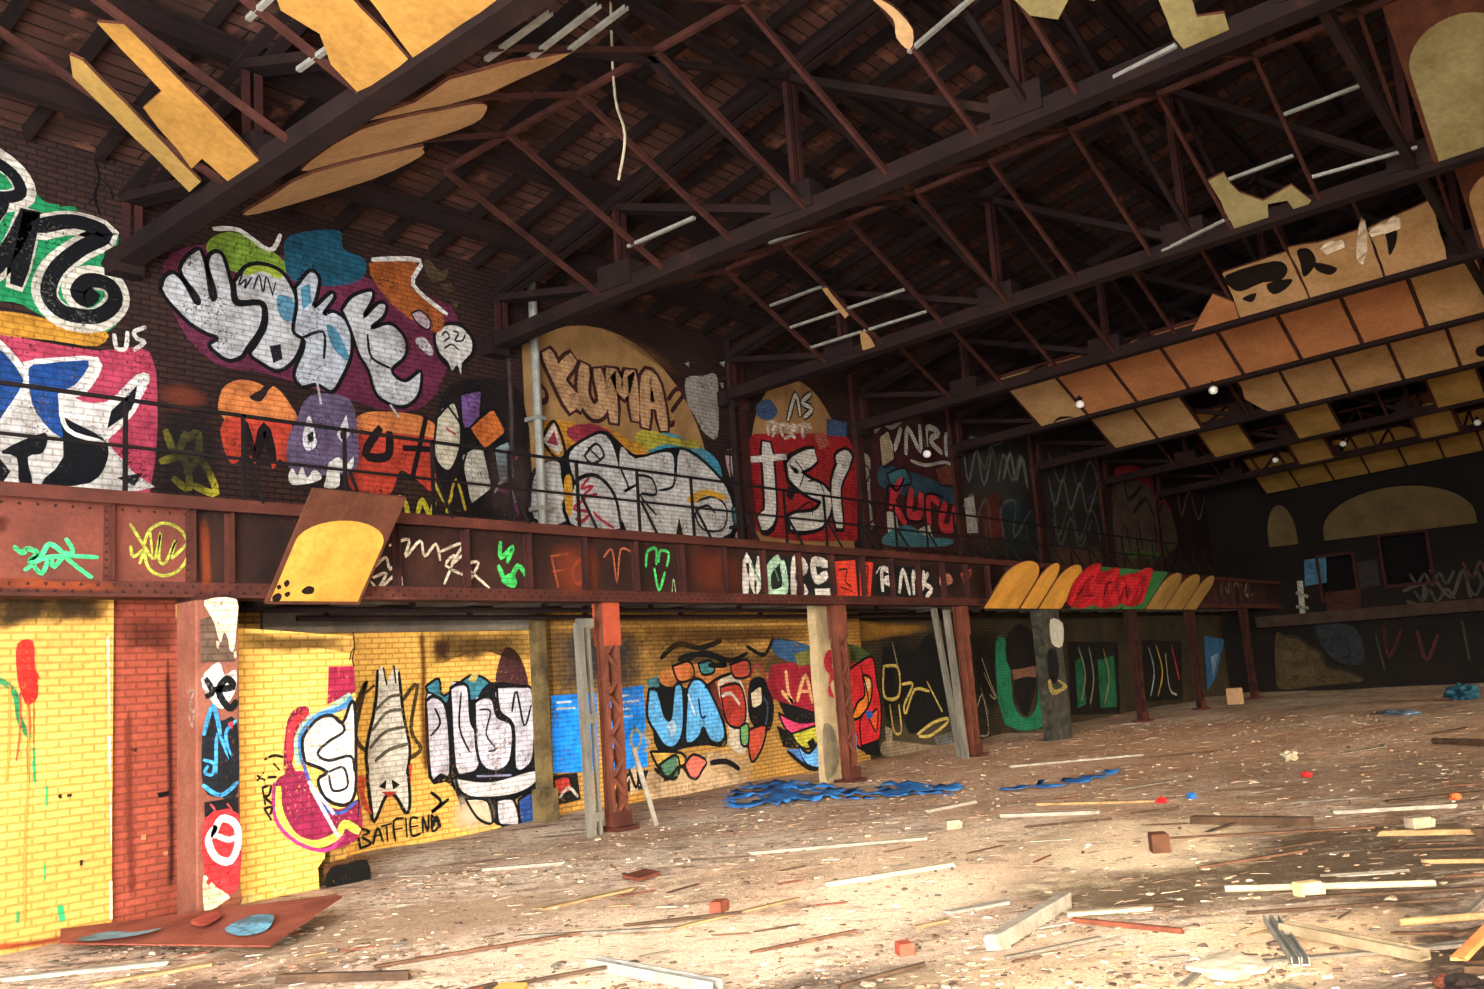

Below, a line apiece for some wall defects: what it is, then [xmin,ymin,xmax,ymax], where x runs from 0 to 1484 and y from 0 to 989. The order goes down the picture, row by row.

peeling [1224,216,1401,302]